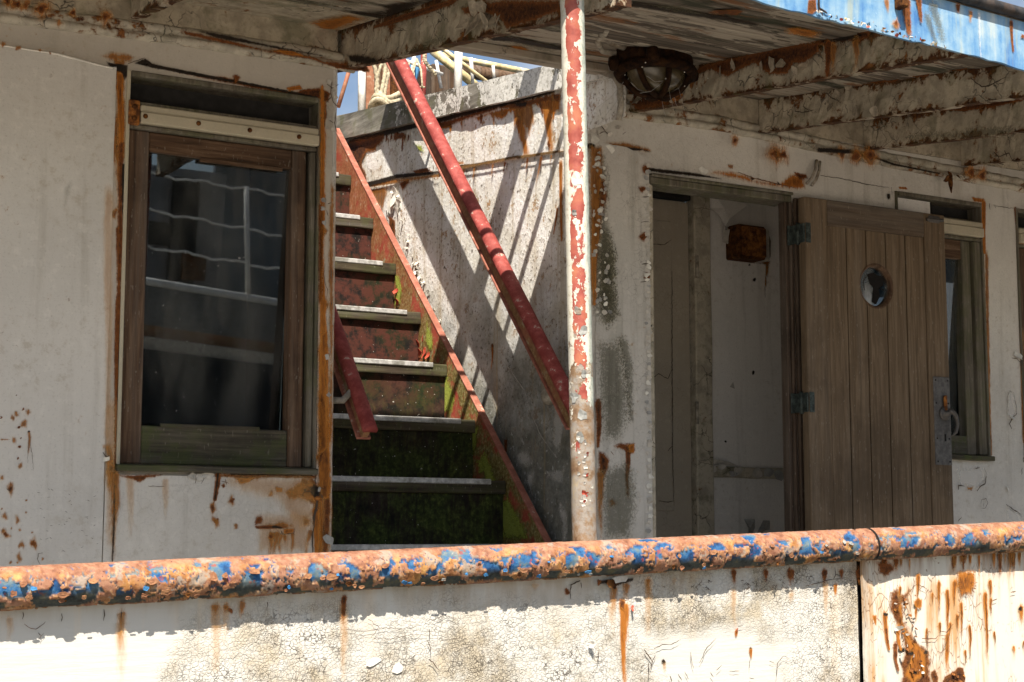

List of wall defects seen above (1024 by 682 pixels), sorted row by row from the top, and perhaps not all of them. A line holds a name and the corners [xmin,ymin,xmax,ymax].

spalling [697,42,819,77]
peeling [816,9,946,49]
rust [437,91,562,241]
rust [649,145,807,189]
rust [817,145,986,193]
rust [104,53,164,562]
rust [147,63,334,553]
rust [1,500,44,564]
rust [610,584,630,682]
rust [883,612,905,671]
rust [878,559,920,594]
rust [926,553,1021,664]